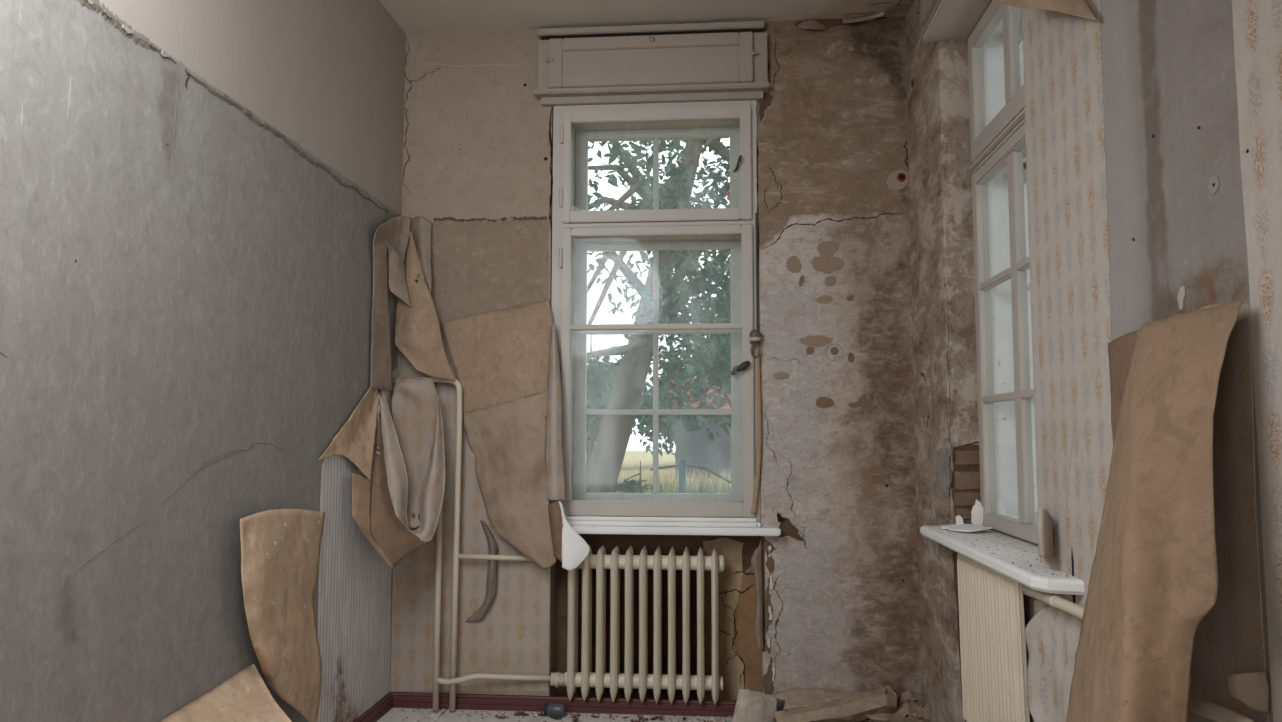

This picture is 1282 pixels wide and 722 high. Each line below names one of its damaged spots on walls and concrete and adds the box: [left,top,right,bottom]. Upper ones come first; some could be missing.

crack [403,42,535,208]
peeling [799,335,832,355]
peeling [786,240,855,304]
peeling [815,393,867,409]
flaking render [940,290,992,532]
peeling [703,512,805,701]
flaking render [952,551,963,707]